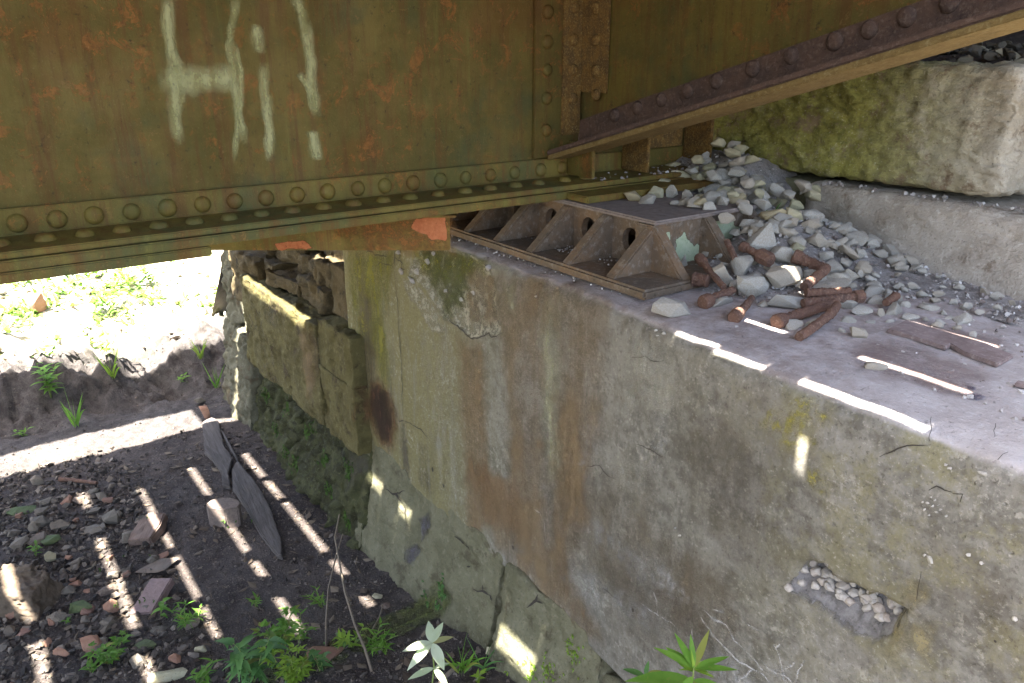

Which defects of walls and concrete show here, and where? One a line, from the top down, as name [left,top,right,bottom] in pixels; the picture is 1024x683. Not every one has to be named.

spalling [398,218,502,339]
crack [880,418,932,457]
spalling [784,560,907,640]